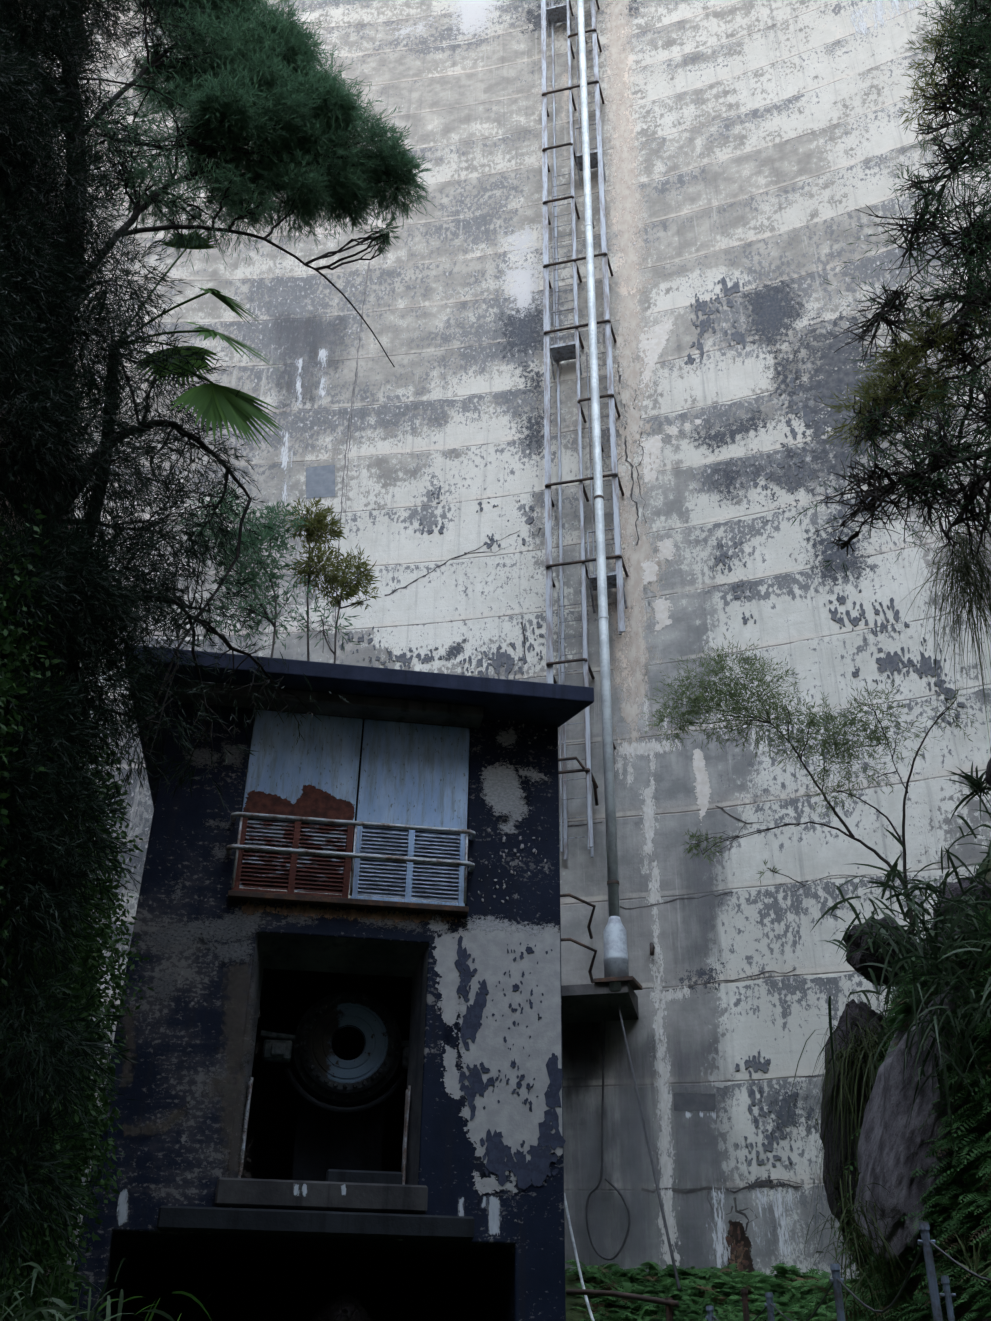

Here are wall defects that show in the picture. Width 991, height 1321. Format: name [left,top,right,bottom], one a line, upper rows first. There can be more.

leakage [281,316,336,405]
leakage [280,429,293,505]
crack [385,530,520,596]
leakage [598,0,731,1269]
peeling [356,720,566,1195]
leakage [574,1112,604,1268]
leakage [753,1187,801,1259]